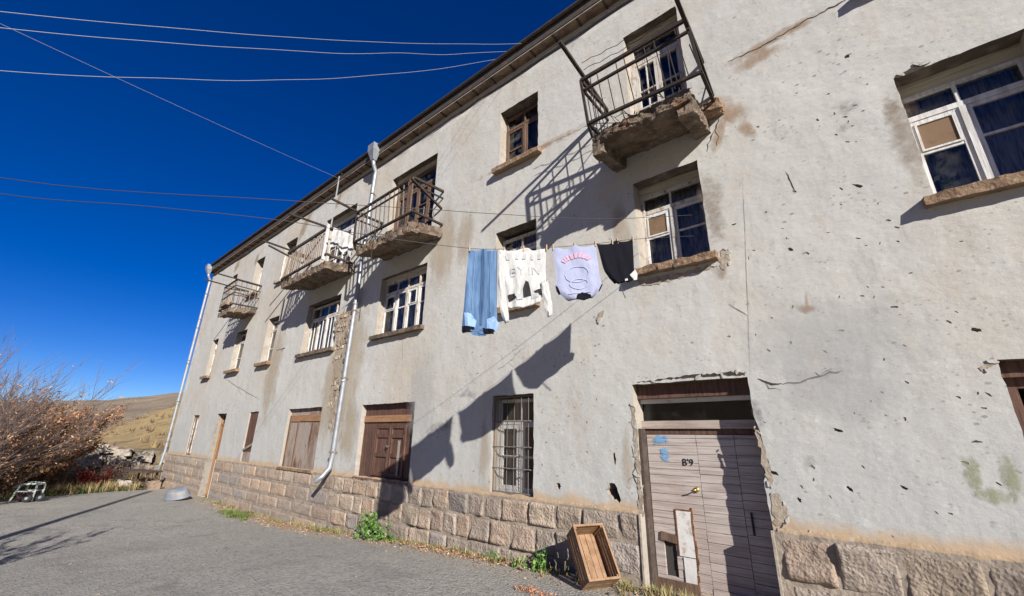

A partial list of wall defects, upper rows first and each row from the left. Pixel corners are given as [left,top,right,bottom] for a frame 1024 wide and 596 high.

crack [730,0,845,61]
crack [729,198,842,389]
flaking render [328,310,352,433]
flaking render [640,370,748,382]
hole [607,483,621,503]
flaking render [754,421,815,533]